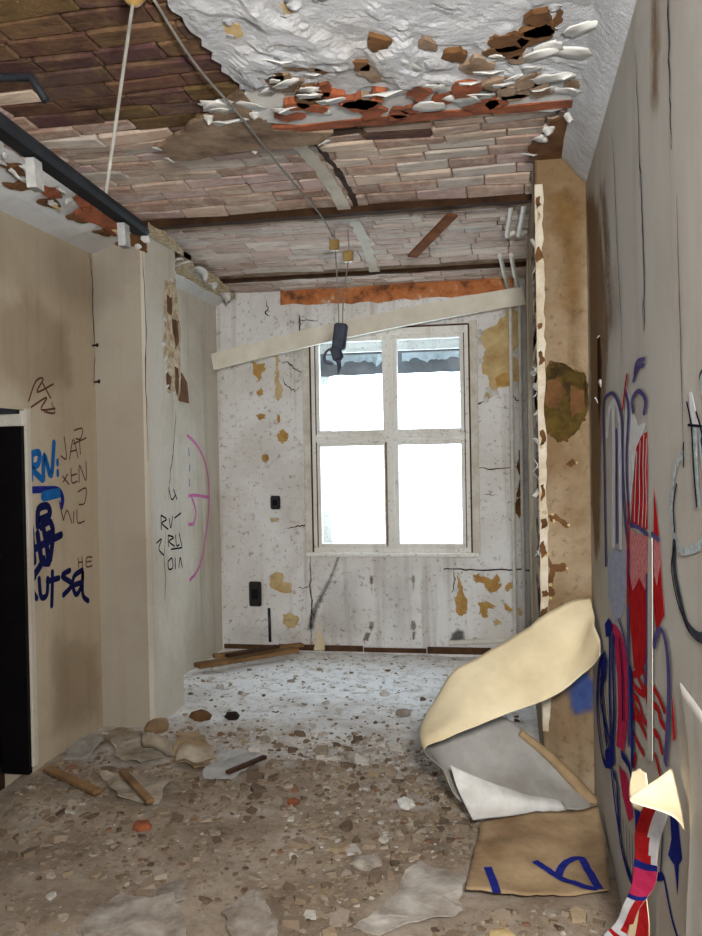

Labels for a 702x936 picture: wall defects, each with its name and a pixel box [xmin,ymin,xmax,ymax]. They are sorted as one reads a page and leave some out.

peeling [152,4,598,163]
crack [665,0,673,130]
spalling [0,151,118,246]
peeling [130,222,237,403]
peeling [475,307,519,403]
peeling [515,184,570,620]
damp [544,194,611,550]
crack [616,158,645,350]
peeling [454,572,522,627]
peeling [542,698,551,731]